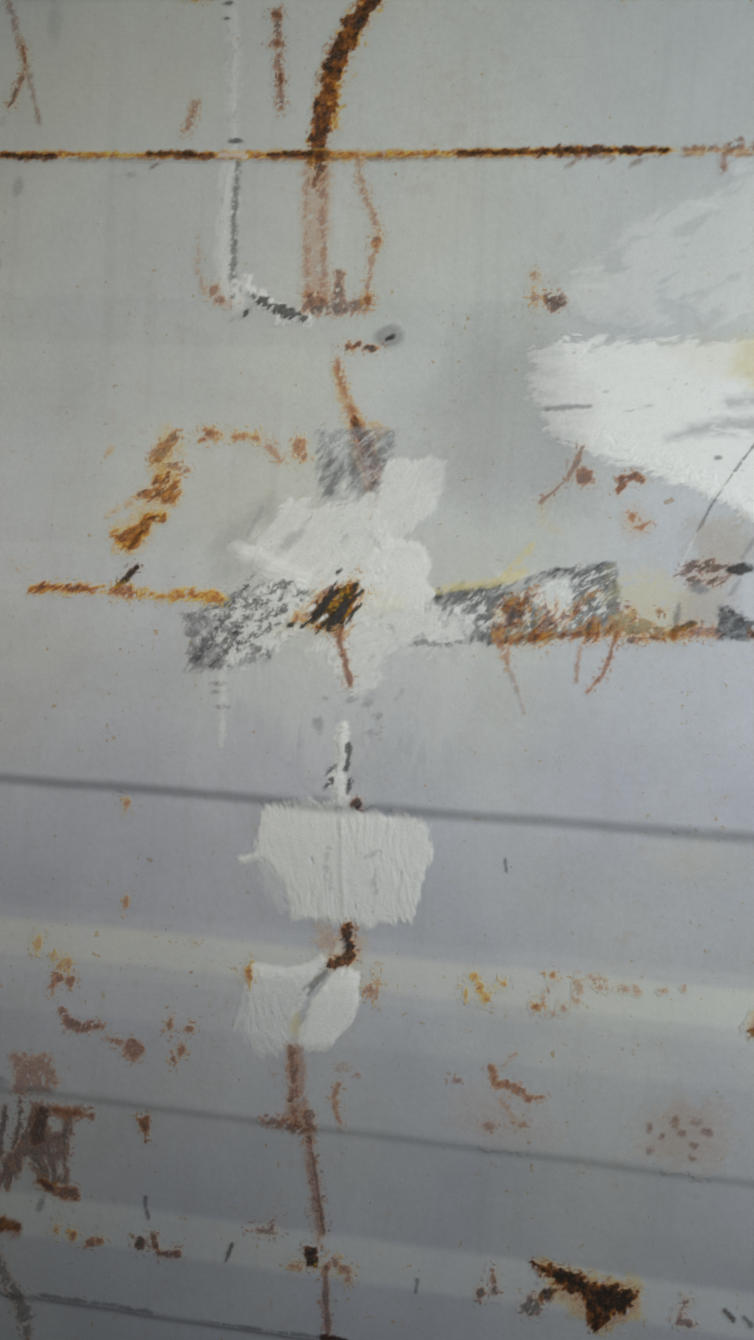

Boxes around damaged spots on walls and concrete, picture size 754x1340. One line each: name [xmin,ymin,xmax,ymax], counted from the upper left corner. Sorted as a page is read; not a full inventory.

rust [261,0,393,322]
rust [6,419,317,611]
rust [487,466,754,716]
rust [309,912,388,1013]
rust [0,1238,38,1340]
rust [0,924,201,1266]
rust [241,1039,367,1334]
rust [471,1252,648,1340]